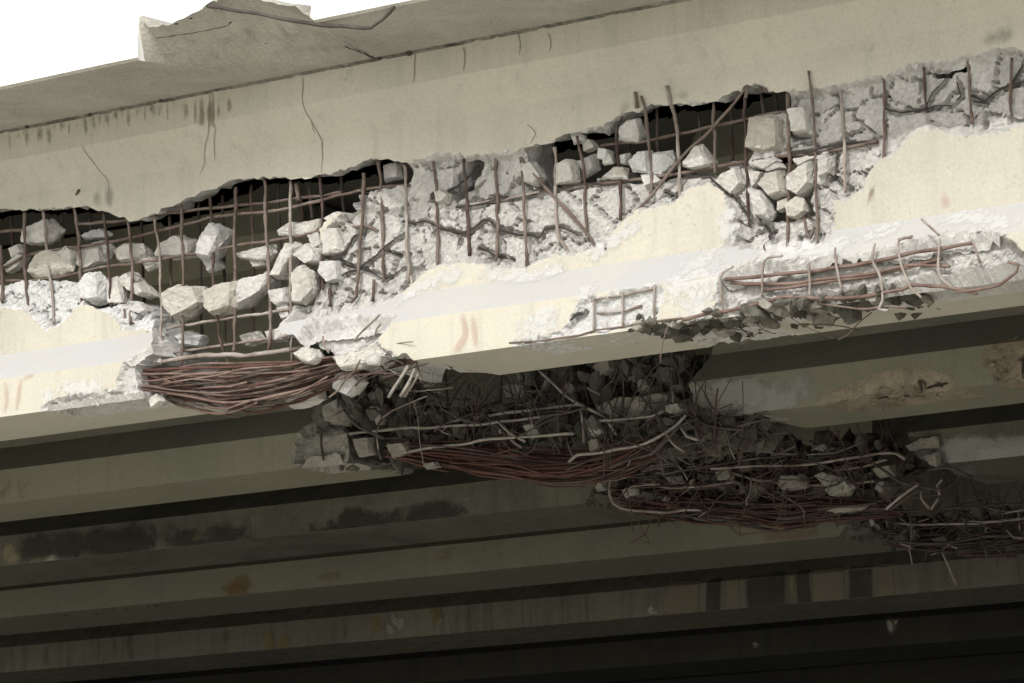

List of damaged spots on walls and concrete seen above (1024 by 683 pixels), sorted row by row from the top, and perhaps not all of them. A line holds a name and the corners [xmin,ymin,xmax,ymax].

crack [201,92,216,171]
crack [302,78,323,167]
spalling [281,47,1024,376]
spalling [0,279,155,332]
spalling [38,345,181,418]
spalling [690,384,792,422]
spalling [814,368,985,412]
spalling [980,335,1024,391]
spalling [292,423,371,474]
spalling [909,436,990,475]
spalling [584,479,625,512]
water stain [3,521,246,563]